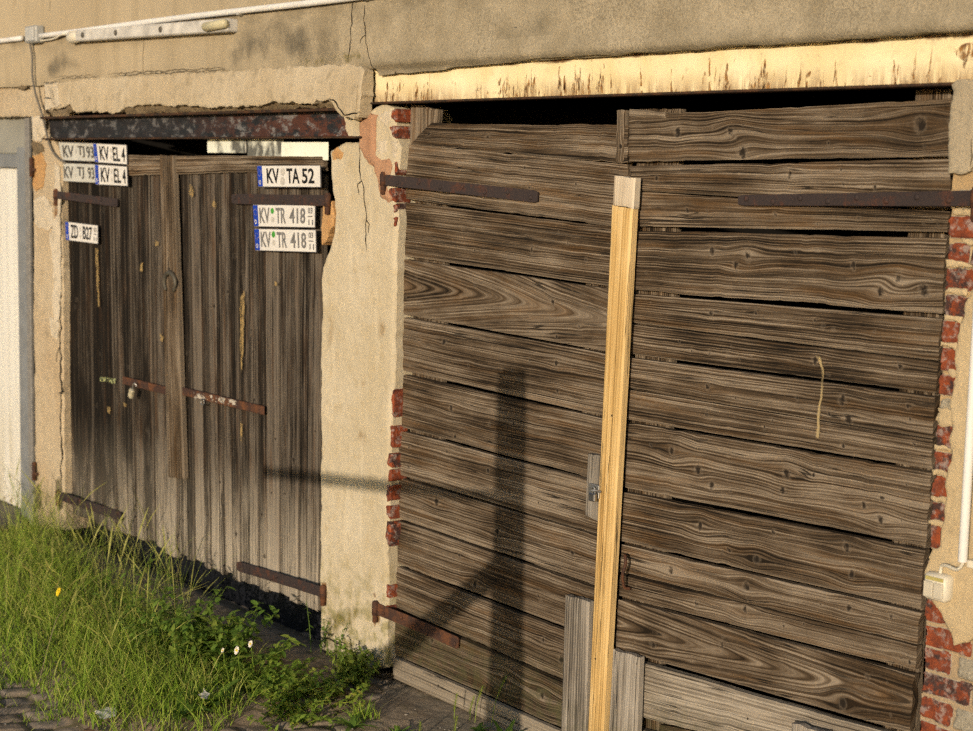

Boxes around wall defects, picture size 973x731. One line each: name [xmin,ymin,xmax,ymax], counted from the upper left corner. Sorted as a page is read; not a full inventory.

crack [348,1,378,72]
flaking render [389,109,411,139]
peeling [948,79,973,174]
crack [357,149,370,251]
flaking render [389,188,410,227]
peeling [951,206,971,216]
peeling [946,259,973,268]
flaking render [385,389,408,546]
peeling [925,287,973,645]
flaking render [386,584,401,611]